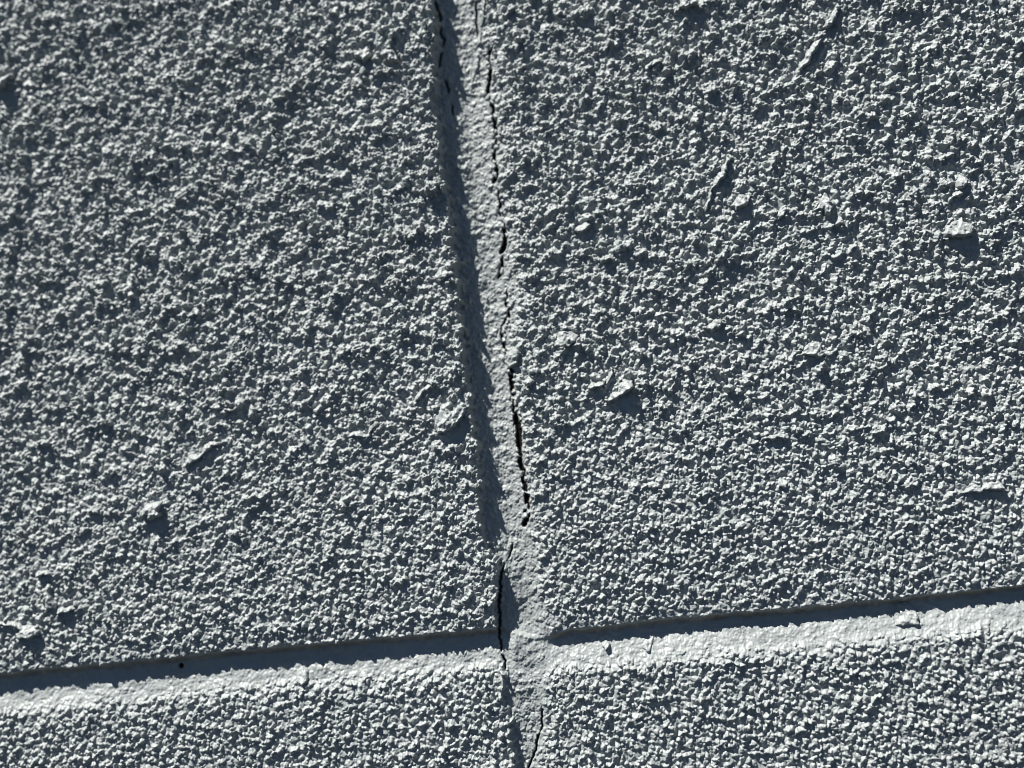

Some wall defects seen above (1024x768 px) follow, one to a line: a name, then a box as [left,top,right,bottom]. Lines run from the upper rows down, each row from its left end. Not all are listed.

crack [475,3,530,668]